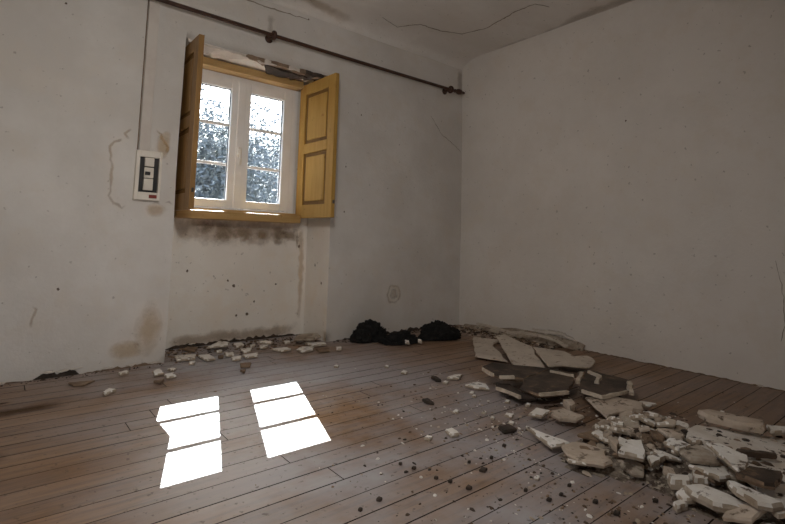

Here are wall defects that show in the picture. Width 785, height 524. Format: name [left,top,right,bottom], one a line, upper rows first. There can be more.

spalling [165,333,327,362]